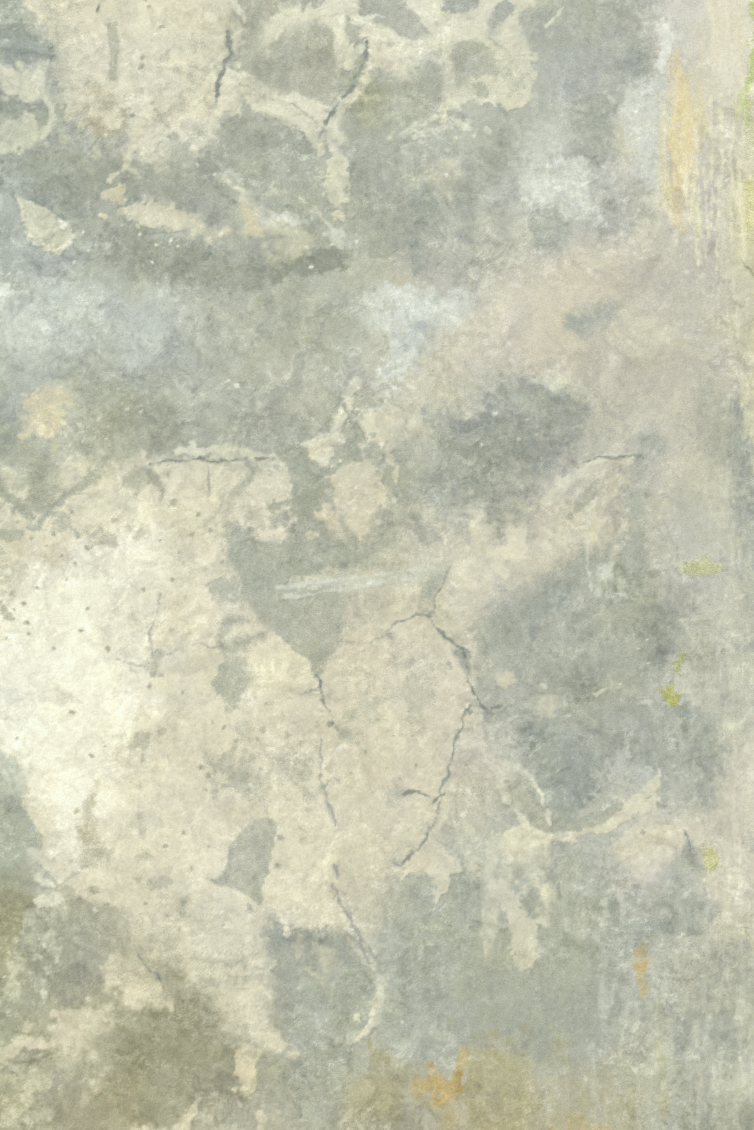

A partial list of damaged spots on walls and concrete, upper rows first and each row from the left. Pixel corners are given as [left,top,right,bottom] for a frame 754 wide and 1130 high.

crack [211,27,372,154]
crack [739,257,754,280]
crack [147,454,280,497]
crack [285,672,341,828]
crack [334,565,514,869]
rust [327,1028,617,1130]